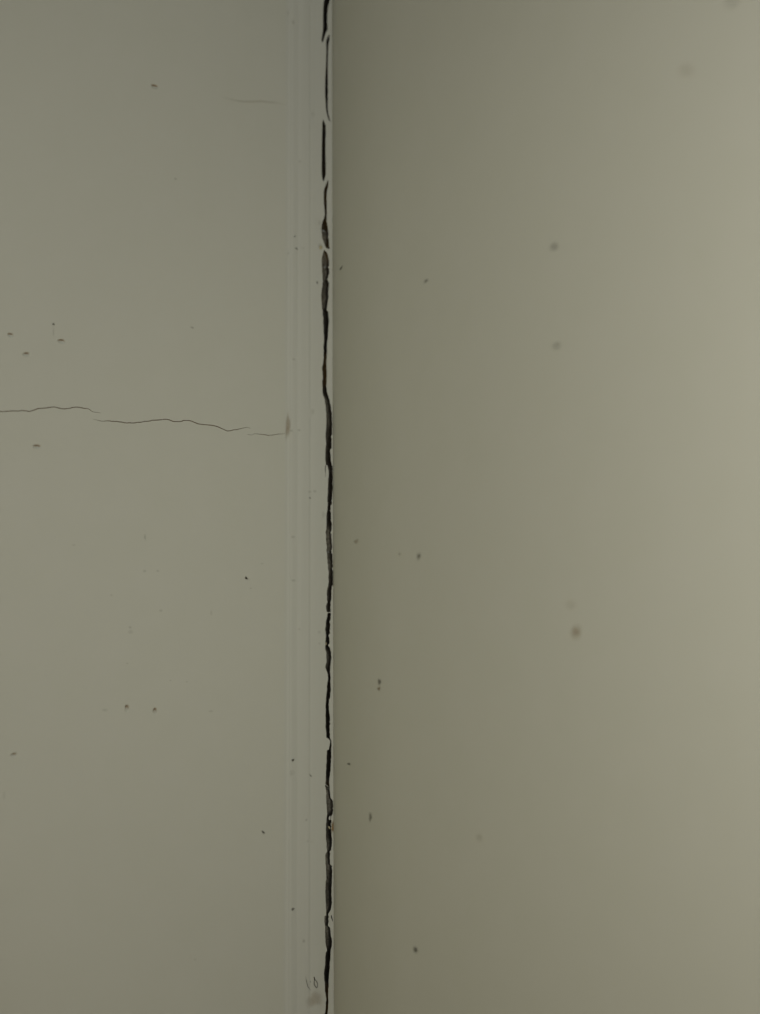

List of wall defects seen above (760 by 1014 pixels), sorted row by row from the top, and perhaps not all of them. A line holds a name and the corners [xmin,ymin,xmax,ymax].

crack [0,407,285,436]
crack [319,0,333,1014]